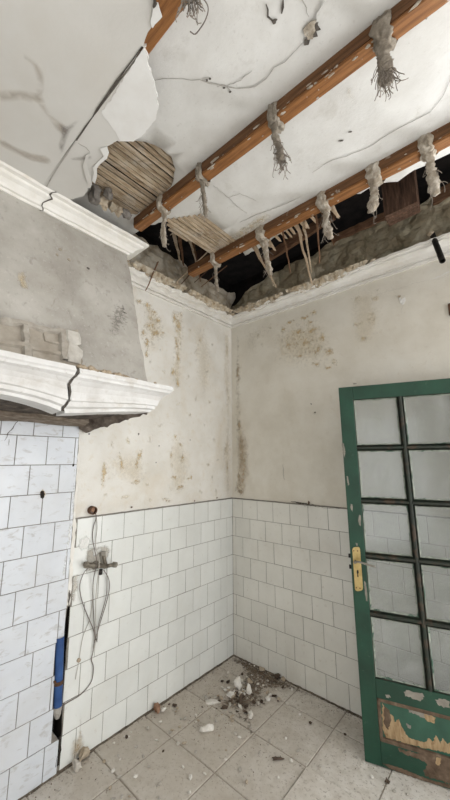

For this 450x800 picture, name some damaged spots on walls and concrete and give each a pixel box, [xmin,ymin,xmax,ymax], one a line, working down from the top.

peeling [102,48,159,142]
crack [40,46,142,211]
peeling [83,146,109,185]
spalling [127,258,376,316]
spalling [0,317,83,366]
crack [61,368,80,411]